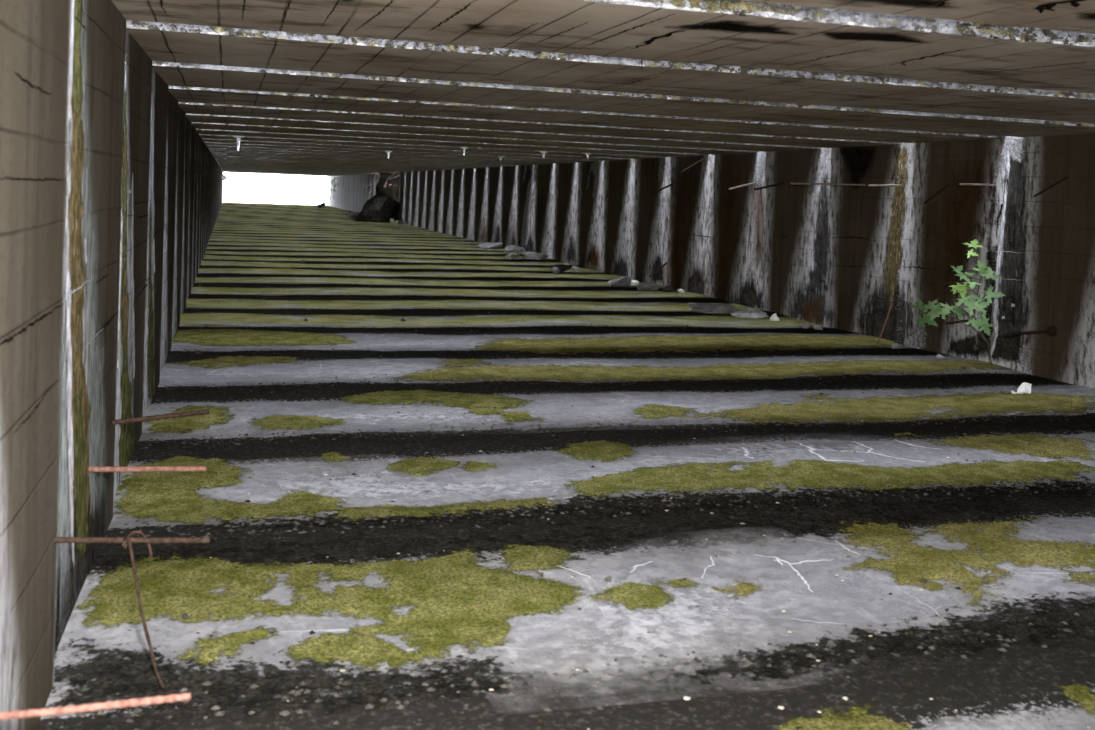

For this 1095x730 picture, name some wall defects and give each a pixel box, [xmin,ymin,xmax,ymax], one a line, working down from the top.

crack [426,0,477,33]
crack [1035,0,1085,13]
crack [505,14,757,87]
crack [793,440,937,462]
crack [754,540,860,590]